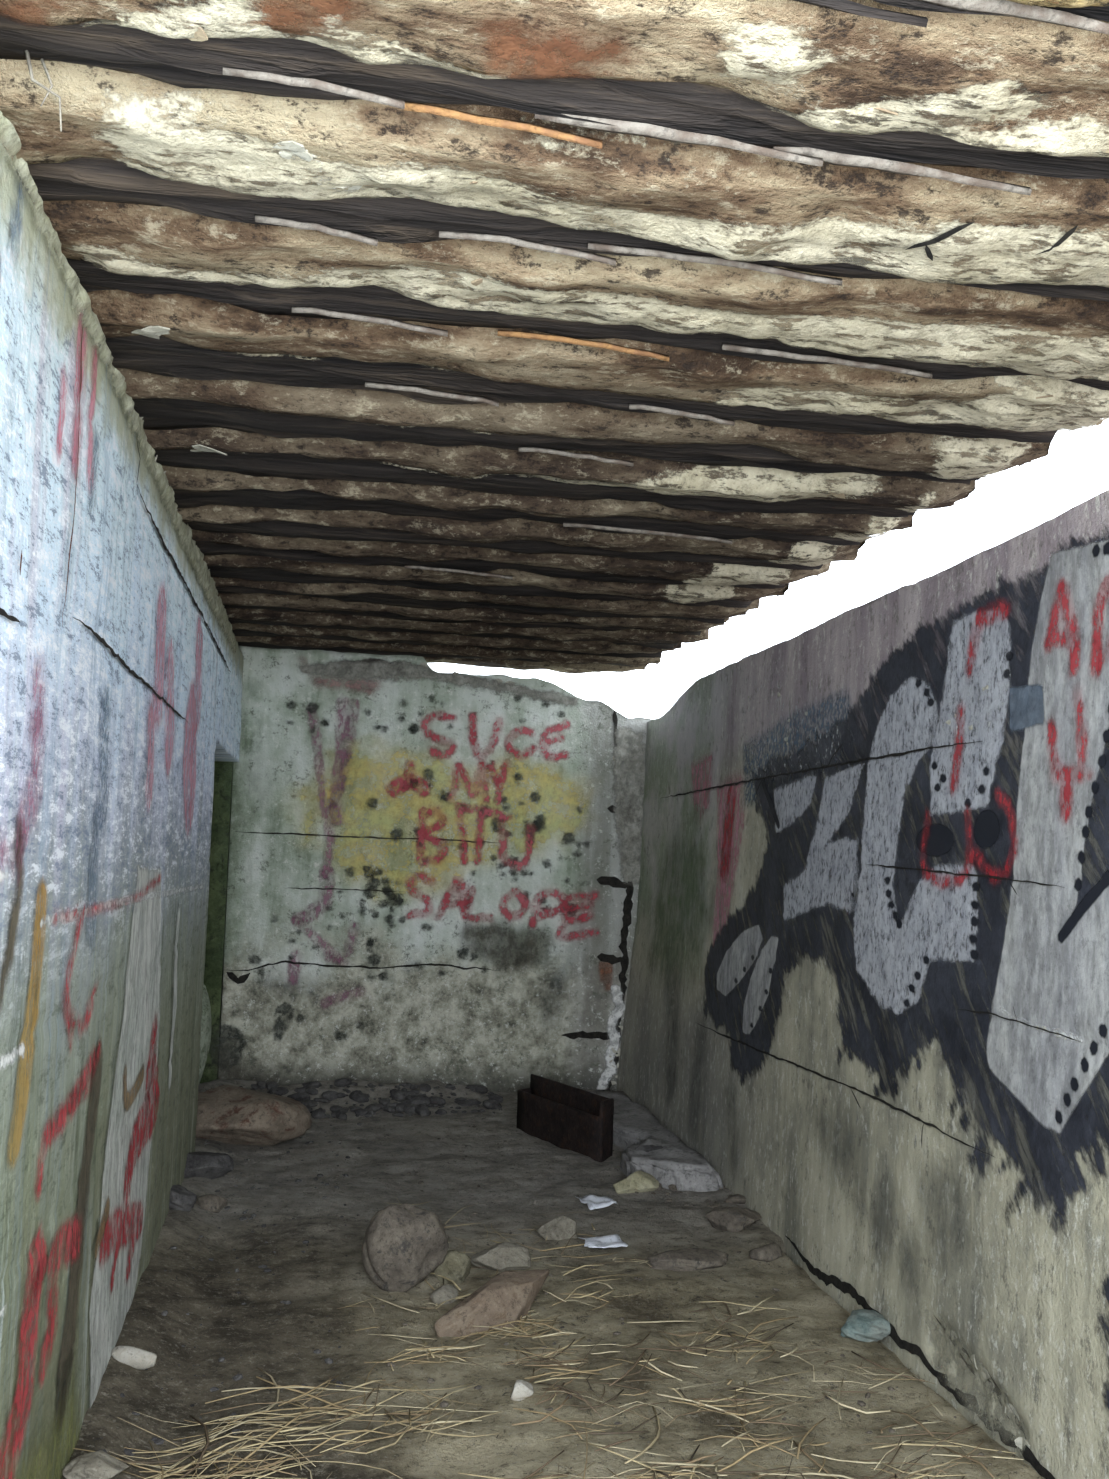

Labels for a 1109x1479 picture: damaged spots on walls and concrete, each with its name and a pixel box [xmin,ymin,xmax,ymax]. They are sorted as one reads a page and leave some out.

peeling [83,0,510,79]
peeling [1008,0,1109,8]
peeling [717,21,1109,157]
peeling [0,88,1109,651]
crack [73,617,188,722]
leakage [248,956,264,992]
leakage [210,1024,280,1083]
leakage [273,1002,303,1040]
crack [785,1235,1055,1479]